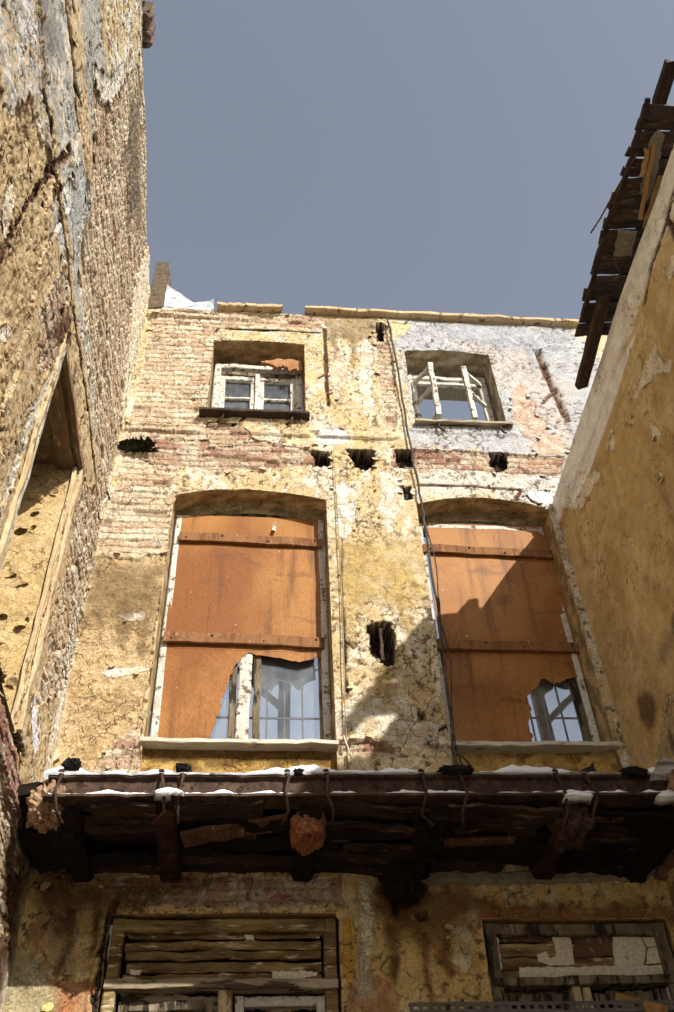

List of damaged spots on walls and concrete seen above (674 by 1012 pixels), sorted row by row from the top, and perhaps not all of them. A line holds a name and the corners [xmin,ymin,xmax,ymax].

peeling [11,0,47,63]
crack [40,68,48,90]
crack [0,114,75,264]
peeling [632,343,673,399]
flaking render [0,60,349,773]
flaking render [372,385,571,534]
peeling [330,477,362,544]